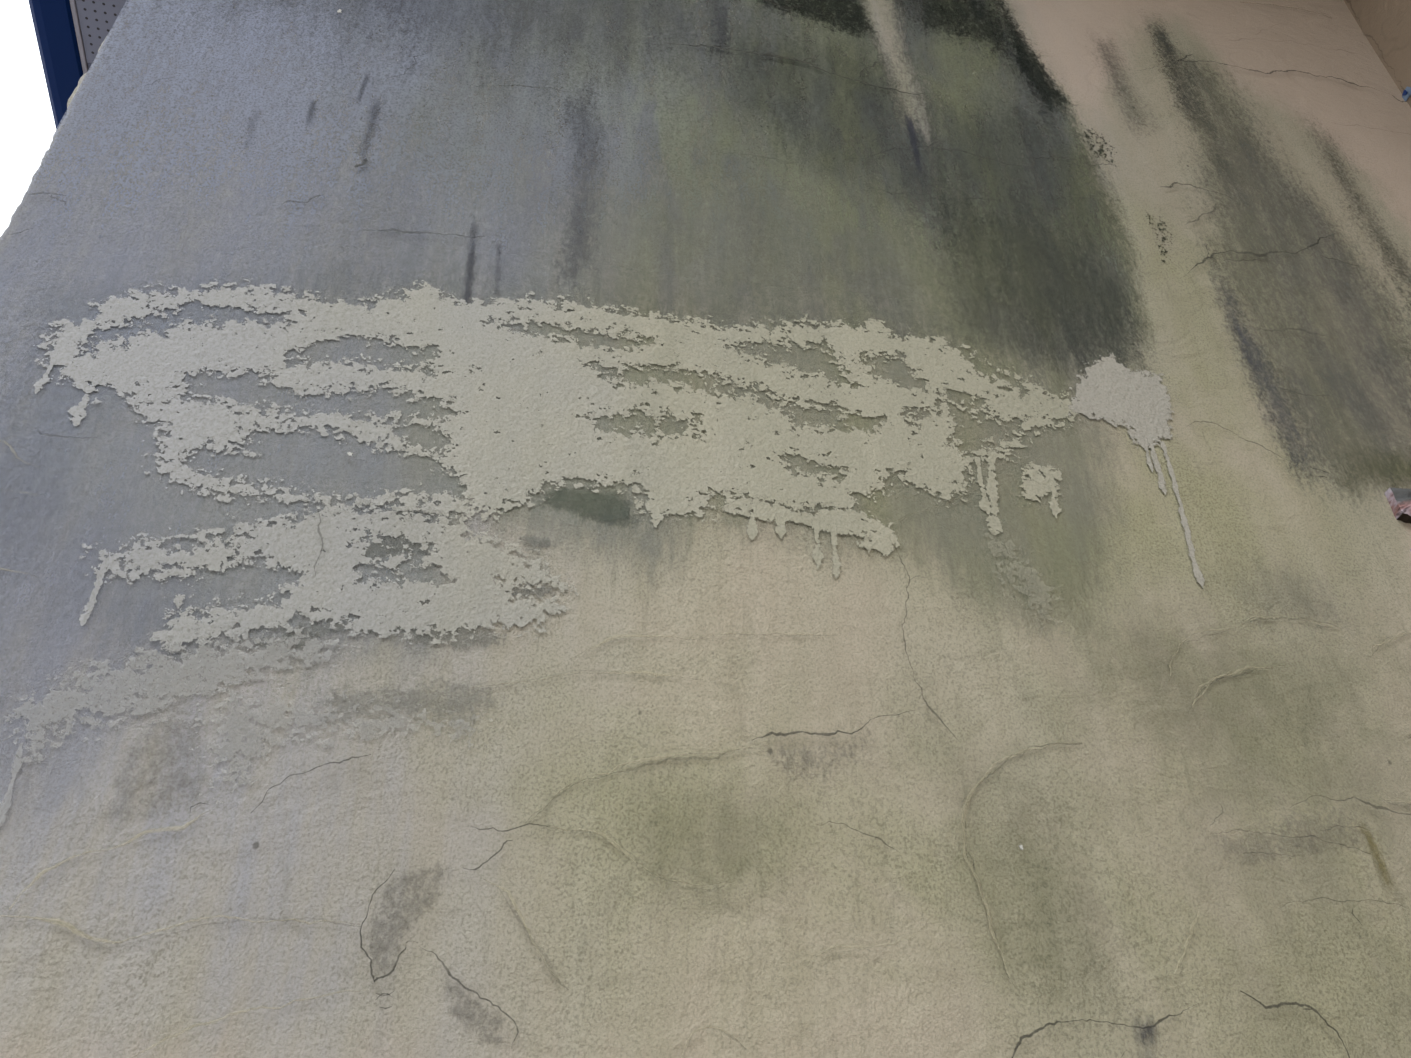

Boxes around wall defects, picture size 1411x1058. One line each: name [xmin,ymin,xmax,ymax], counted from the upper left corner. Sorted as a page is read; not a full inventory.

leakage [1146,212,1172,263]
leakage [1150,28,1411,493]
leakage [0,0,1140,659]
crack [753,545,957,740]
crack [251,754,371,813]
crack [464,823,545,870]
crack [821,821,899,852]
crack [1214,795,1410,854]
crack [1286,897,1394,925]
crack [360,869,519,1044]
crack [1012,1003,1199,1058]
crack [1240,991,1350,1058]